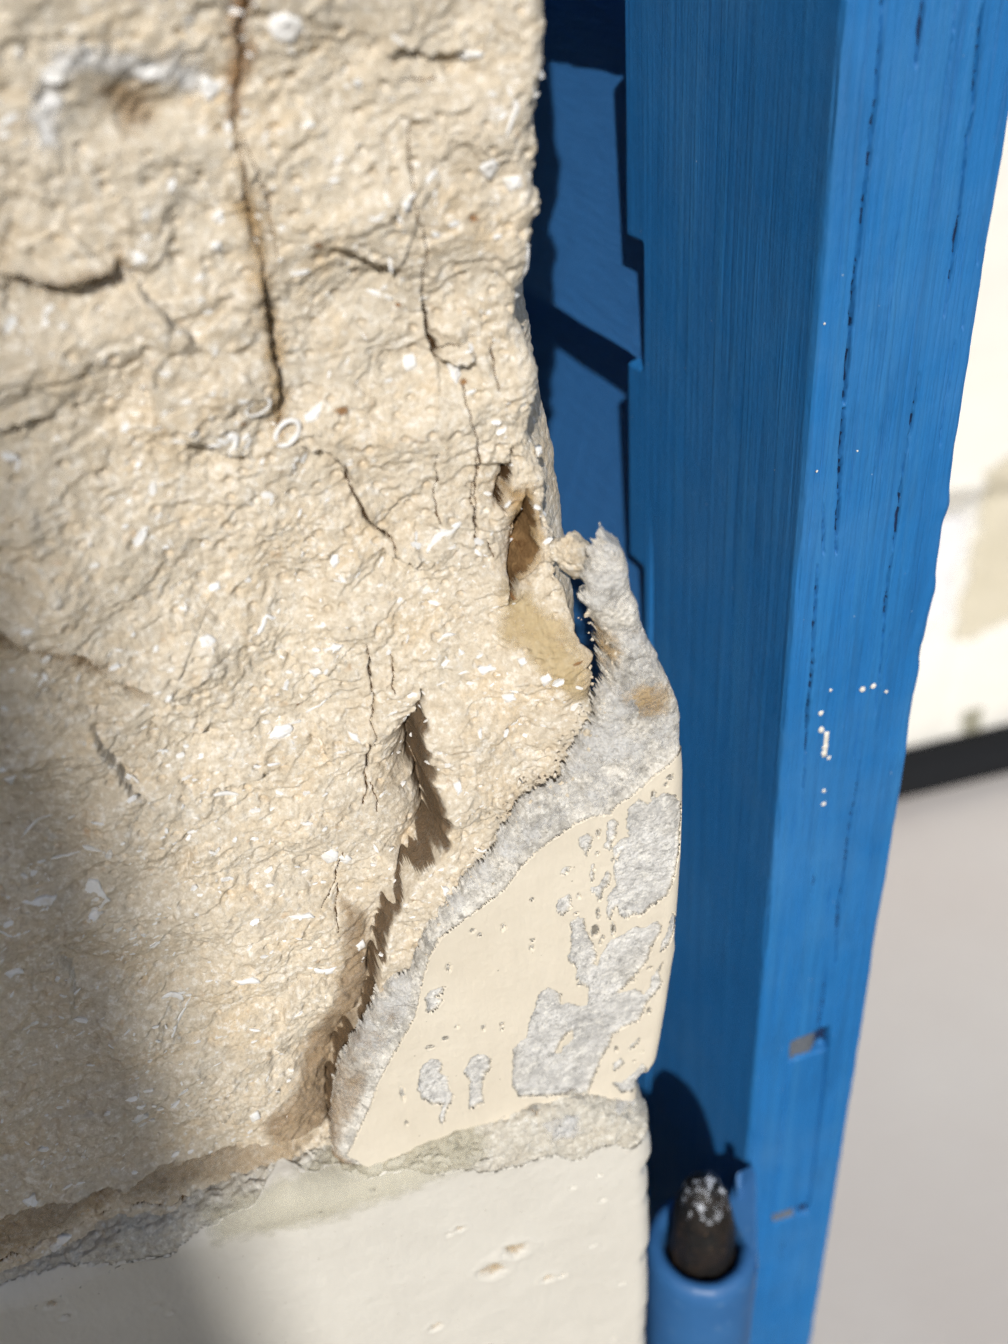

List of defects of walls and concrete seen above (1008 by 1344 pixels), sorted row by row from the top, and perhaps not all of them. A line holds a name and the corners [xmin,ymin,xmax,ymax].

rust [230,0,248,99]
crack [915,0,923,45]
crack [232,0,282,426]
crack [407,127,499,392]
crack [948,215,958,279]
spalling [0,0,595,1273]
crack [336,459,396,559]
crack [432,385,539,603]
crack [835,257,856,530]
crack [882,492,900,632]
crack [321,644,451,1123]
peeling [512,774,680,1094]